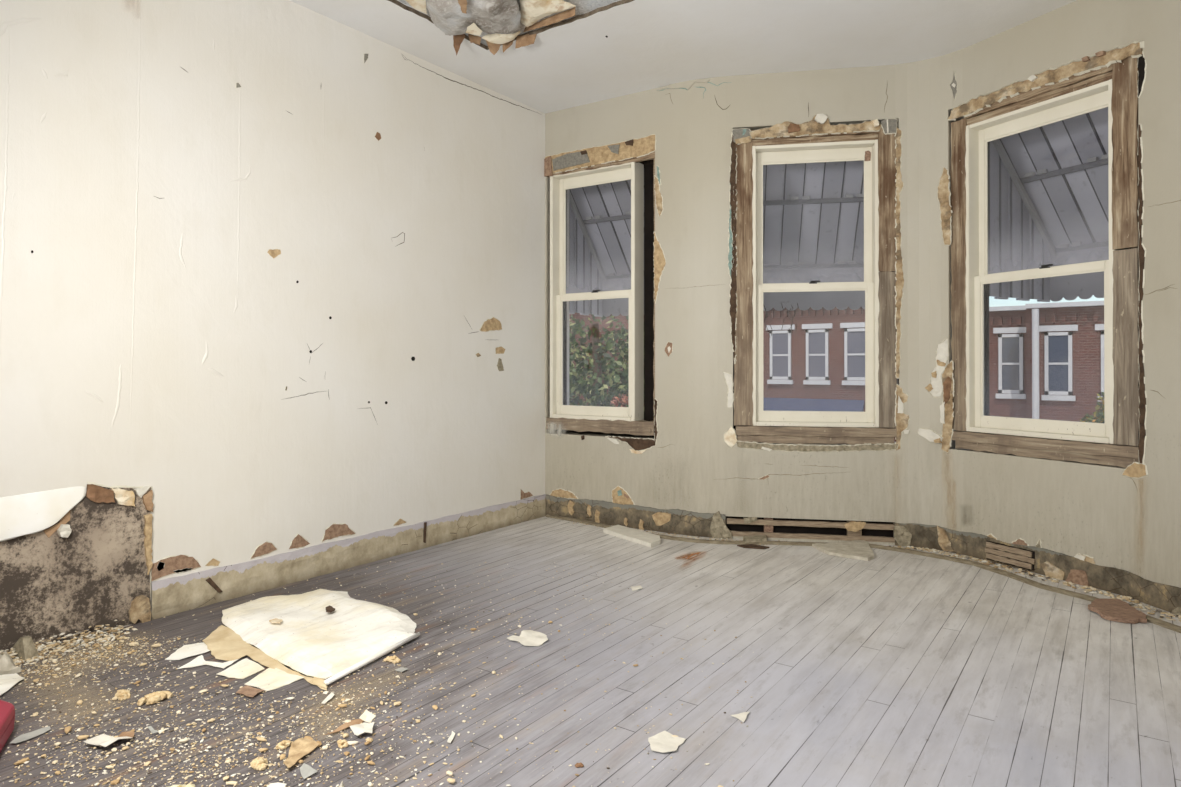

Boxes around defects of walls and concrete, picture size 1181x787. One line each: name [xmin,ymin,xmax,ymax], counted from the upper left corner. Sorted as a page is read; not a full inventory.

spalling [388,0,434,24]
spalling [465,0,634,50]
flaking render [947,41,1147,121]
flaking render [723,113,954,453]
peeling [612,486,635,505]
water stain [0,482,154,655]
peeling [150,554,220,582]
peeling [289,523,356,549]
spalling [986,533,1042,571]
peeling [1074,553,1095,564]